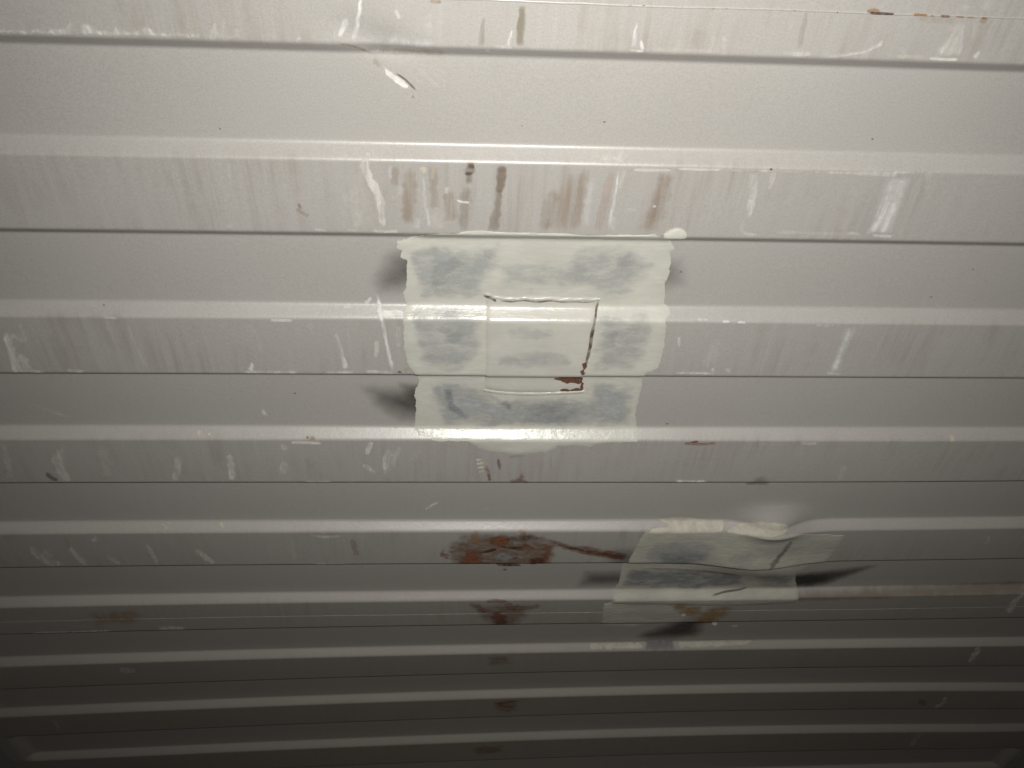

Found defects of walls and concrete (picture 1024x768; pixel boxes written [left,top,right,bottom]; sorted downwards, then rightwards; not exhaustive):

water stain [497,167,506,192]
rust [554,363,587,392]
rust [453,536,557,570]